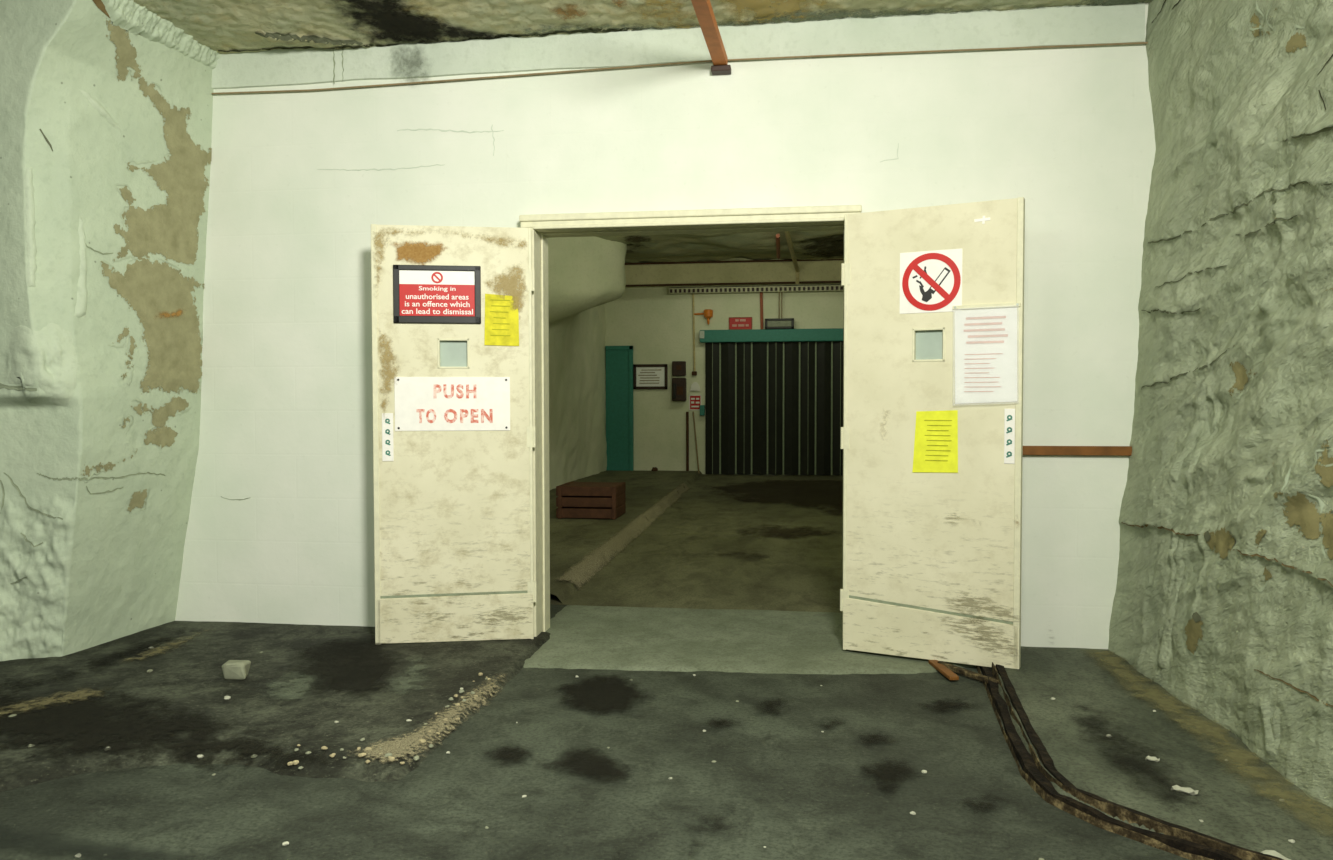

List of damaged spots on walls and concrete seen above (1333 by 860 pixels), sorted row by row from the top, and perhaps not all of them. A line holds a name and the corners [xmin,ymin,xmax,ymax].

crack [1283,54,1333,142]
peeling [81,18,212,483]
crack [1142,181,1332,314]
crack [1142,346,1234,388]
peeling [1228,361,1255,400]
peeling [127,489,150,512]
peeling [1273,439,1333,560]
peeling [1204,526,1235,565]
peeling [1185,612,1203,657]
leakage [271,640,394,699]
leakage [0,689,100,714]